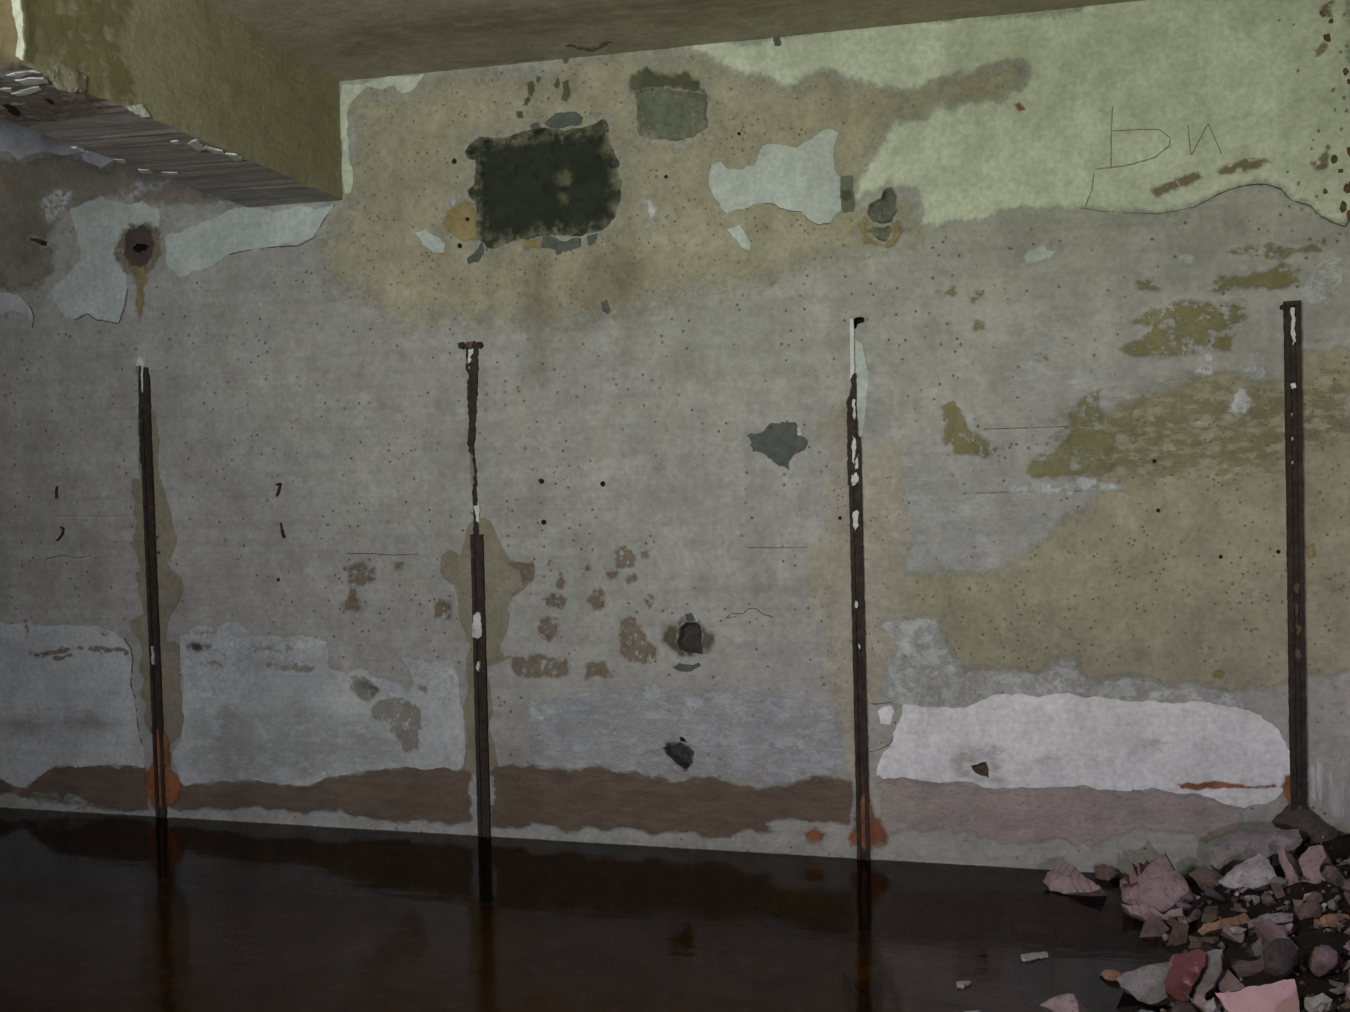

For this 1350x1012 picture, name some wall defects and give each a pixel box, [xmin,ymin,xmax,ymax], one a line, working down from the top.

leakage [553,170,572,204]
peeling [0,0,1350,324]
rust [125,225,154,316]
rust [465,347,479,541]
rust [846,373,862,486]
flaking render [1290,307,1350,675]
flaking render [525,372,1290,808]
rust [144,729,181,809]
leakage [0,765,472,846]
leakage [491,765,856,860]
leakage [870,777,1243,869]
peeling [1307,757,1350,820]